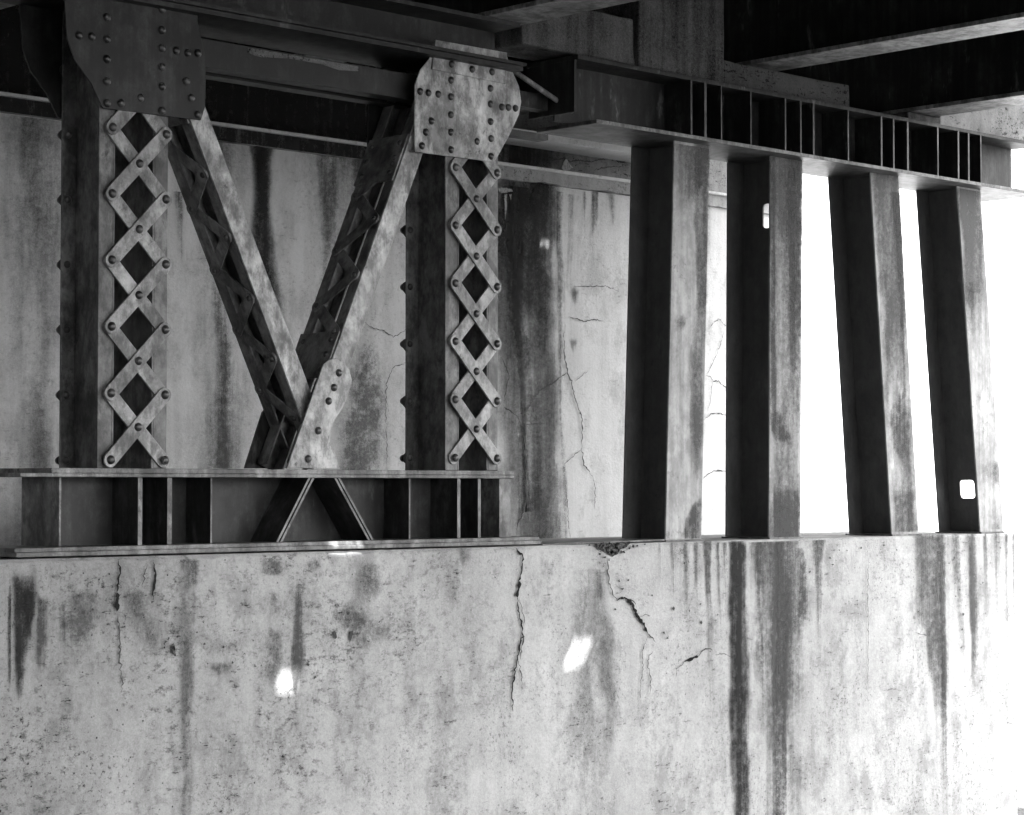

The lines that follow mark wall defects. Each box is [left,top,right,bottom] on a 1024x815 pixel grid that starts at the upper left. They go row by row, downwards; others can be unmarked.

damp [498,179,578,539]
crack [502,317,600,710]
spalling [588,542,646,561]
damp [9,576,46,695]
crack [114,560,157,692]
damp [182,638,193,748]
damp [292,591,305,691]
crack [606,555,731,698]
damp [671,540,824,815]
damp [916,532,1015,726]